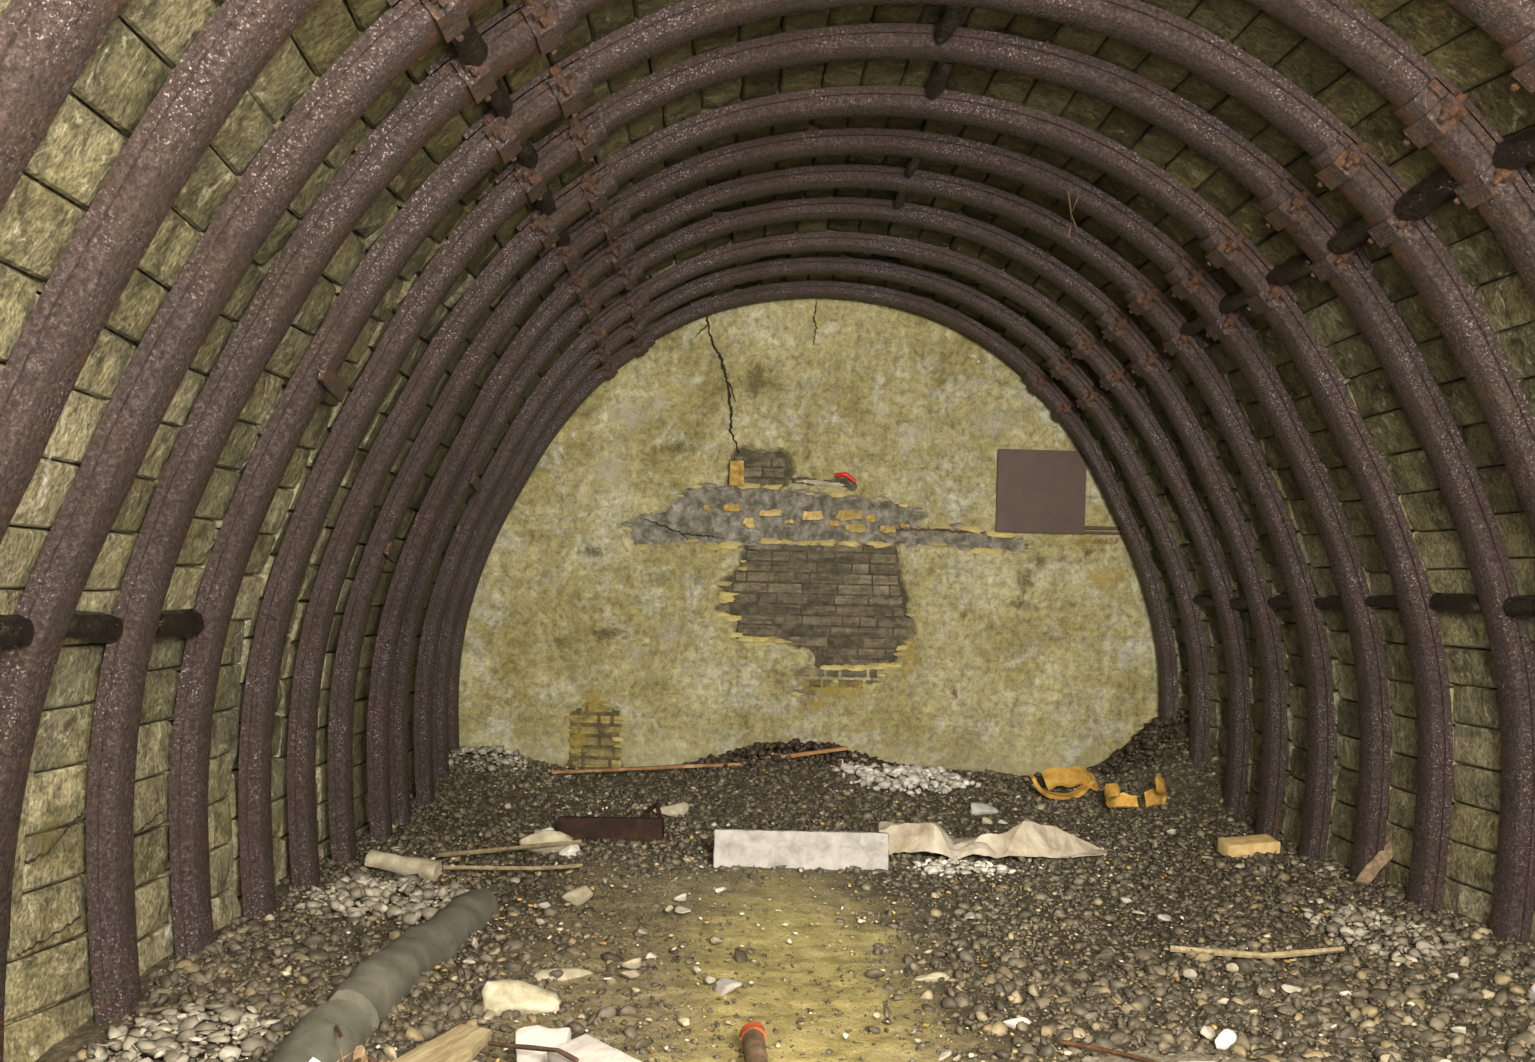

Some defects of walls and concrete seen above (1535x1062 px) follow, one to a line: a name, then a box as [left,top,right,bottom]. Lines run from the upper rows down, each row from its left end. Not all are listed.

crack [695,315,740,453]
flaking render [620,448,1034,696]
flaking render [562,699,627,769]